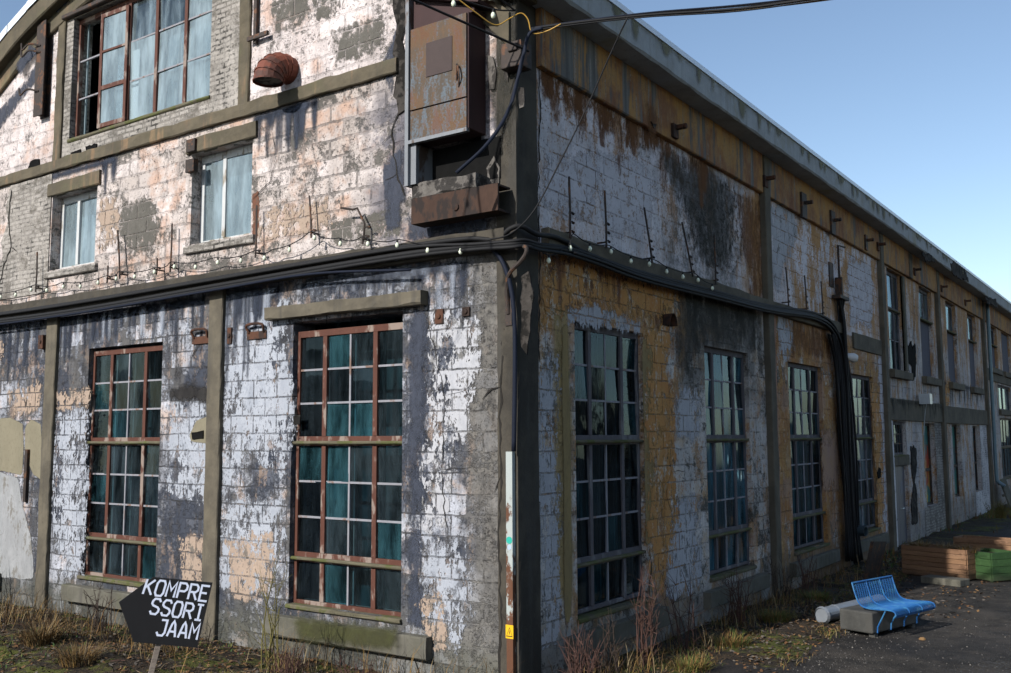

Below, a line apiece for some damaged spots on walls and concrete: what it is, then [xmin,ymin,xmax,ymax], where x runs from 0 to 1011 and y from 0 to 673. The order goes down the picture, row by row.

spalling [392,0,405,115]
leakage [254,99,317,152]
rust [540,71,708,209]
leakage [665,155,743,272]
peeling [51,403,92,579]
peeling [165,387,206,510]
peeling [219,308,301,594]
peeling [419,306,484,655]
peeling [666,487,703,601]
peeling [675,385,702,444]